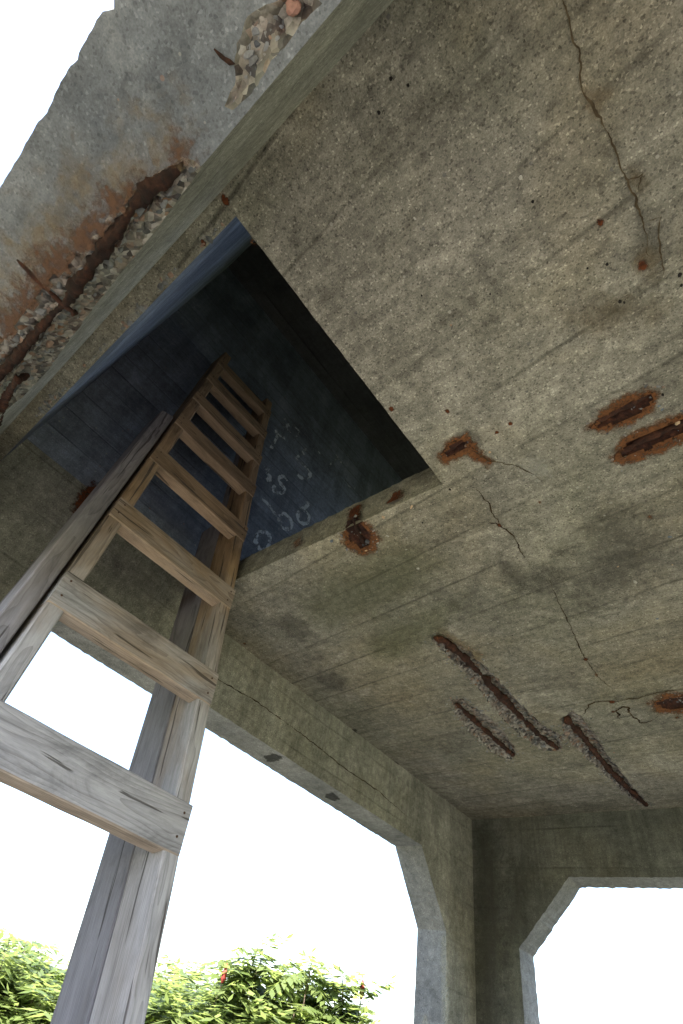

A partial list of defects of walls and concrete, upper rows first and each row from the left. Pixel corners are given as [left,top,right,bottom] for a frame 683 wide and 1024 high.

spalling [225,0,322,110]
crack [562,0,664,274]
spalling [0,129,204,426]
crack [476,489,529,562]
spalling [424,628,655,807]
crack [548,578,683,723]